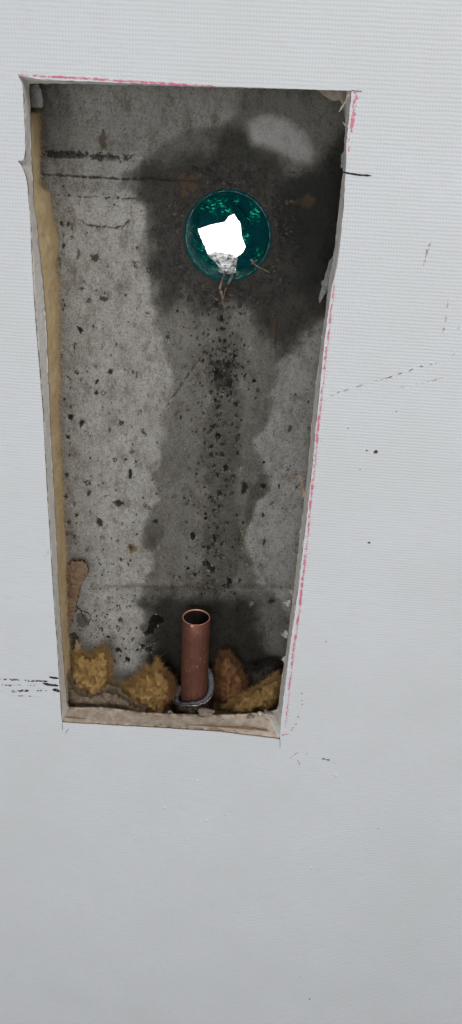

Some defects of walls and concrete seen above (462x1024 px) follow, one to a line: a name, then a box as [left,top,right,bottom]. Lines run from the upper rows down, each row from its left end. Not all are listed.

water stain [144,134,344,343]
water stain [147,599,267,697]